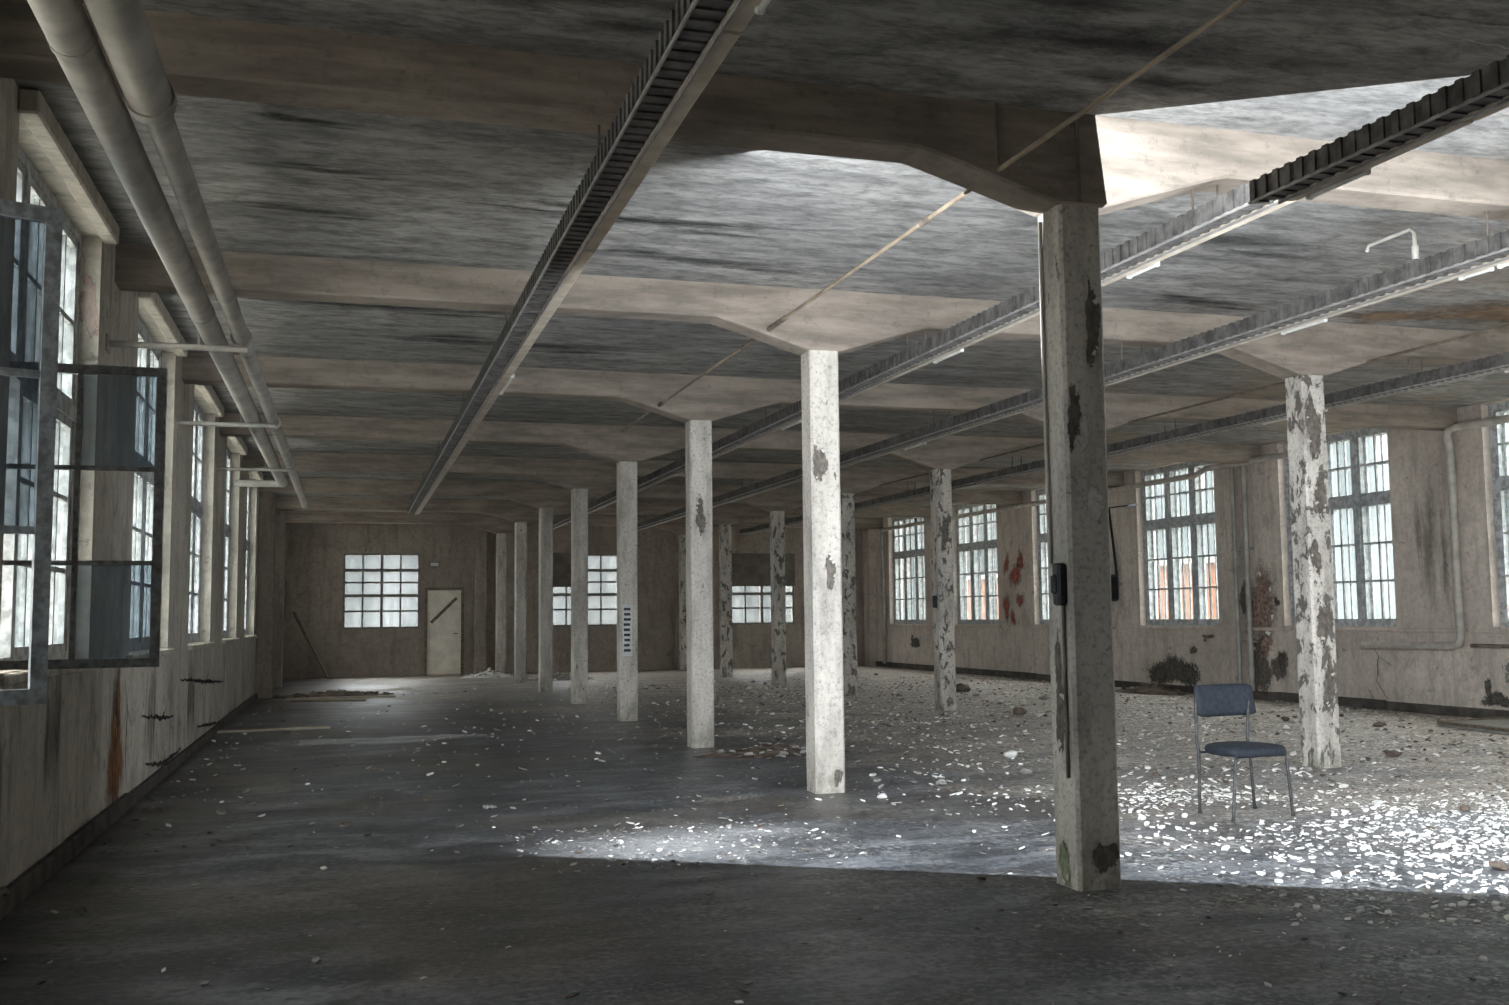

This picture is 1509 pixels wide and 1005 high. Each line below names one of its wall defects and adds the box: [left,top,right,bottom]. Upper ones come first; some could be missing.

peeling [1085,279,1100,368]
peeling [1067,383,1082,452]
peeling [1304,392,1327,519]
peeling [1311,539,1322,577]
flaking render [1239,571,1276,660]
peeling [1316,602,1336,709]